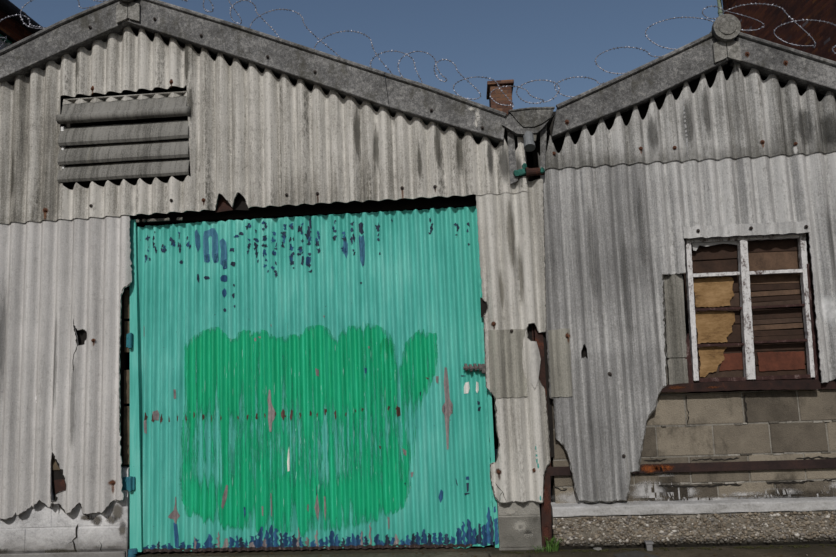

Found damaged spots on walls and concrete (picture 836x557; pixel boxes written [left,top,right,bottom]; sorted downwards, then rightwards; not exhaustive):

peeling [332,220,365,267]
peeling [143,297,546,549]
spalling [0,470,125,534]